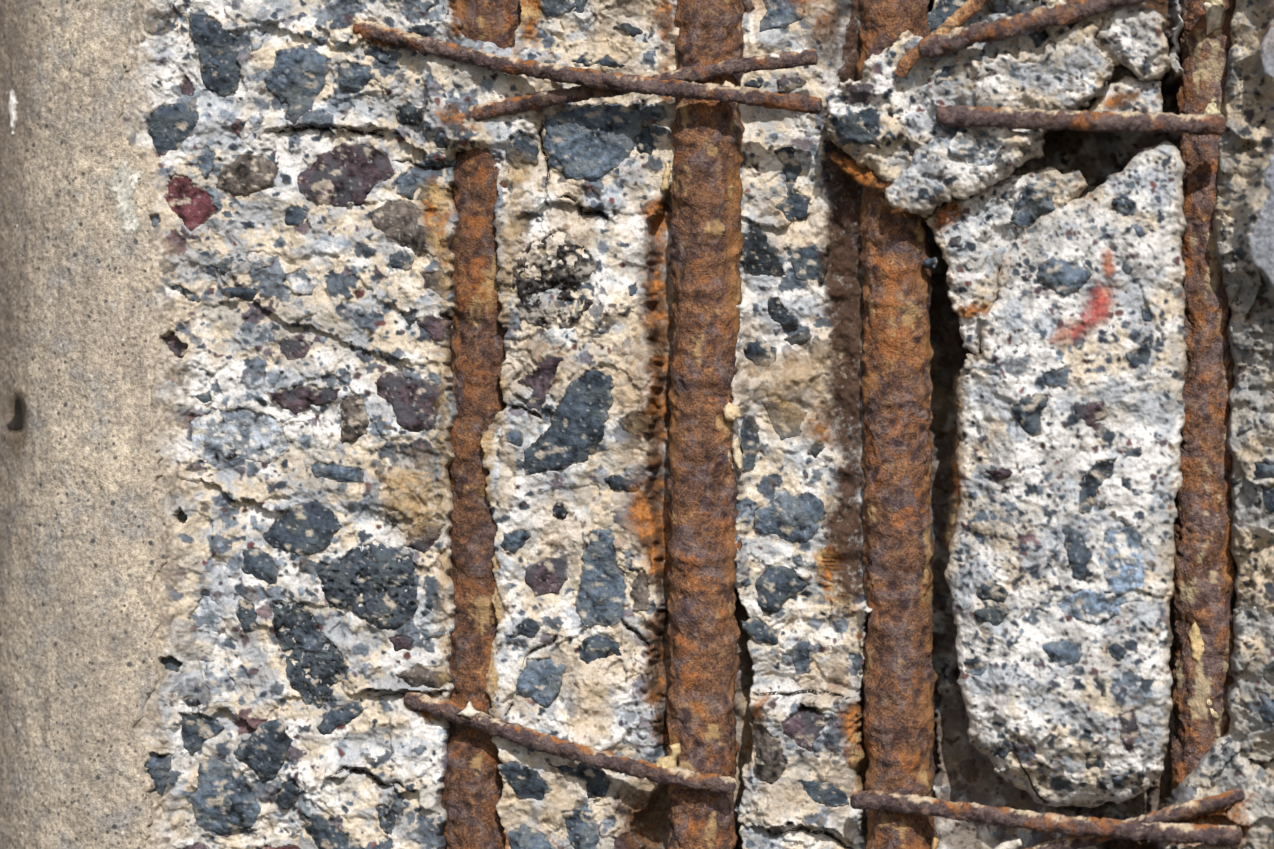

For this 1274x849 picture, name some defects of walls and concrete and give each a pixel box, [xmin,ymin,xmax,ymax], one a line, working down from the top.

rust [520,0,541,46]
rust [1134,0,1171,48]
rust [1105,91,1139,110]
spalling [119,0,679,849]
rust [480,411,502,498]
spalling [728,0,872,849]
spalling [926,0,1274,849]
rust [406,697,444,722]
rust [642,608,670,743]
rust [839,700,869,790]
rust [618,789,667,849]
rust [1177,801,1247,831]